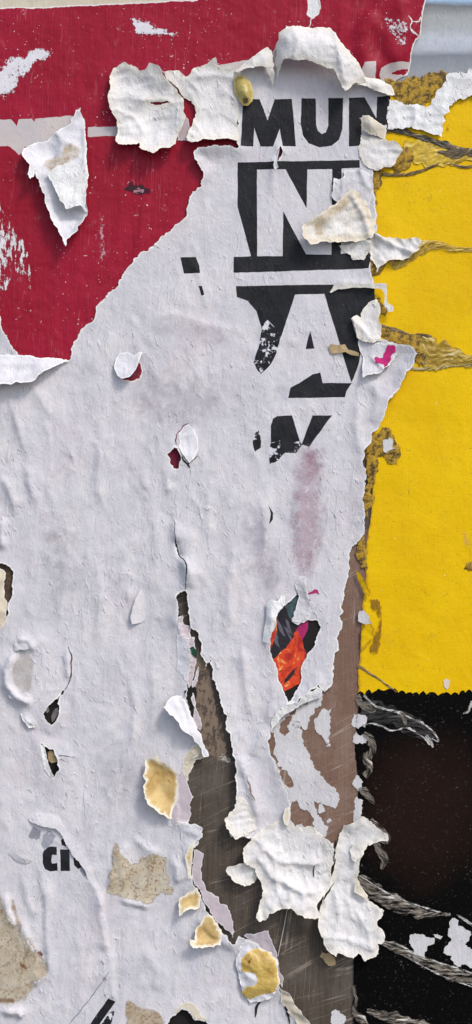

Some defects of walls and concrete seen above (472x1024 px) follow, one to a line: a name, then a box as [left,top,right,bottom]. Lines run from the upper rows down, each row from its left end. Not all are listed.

peeling [22,108,89,246]
peeling [108,26,472,343]
peeling [114,352,142,379]
peeling [383,438,395,453]
crack [174,522,187,590]
peeling [263,576,310,643]
peeling [358,610,375,651]
crack [63,647,73,694]
peeling [143,695,223,948]
peeling [225,797,389,961]
peeling [236,940,280,1003]
peeling [174,1002,208,1021]